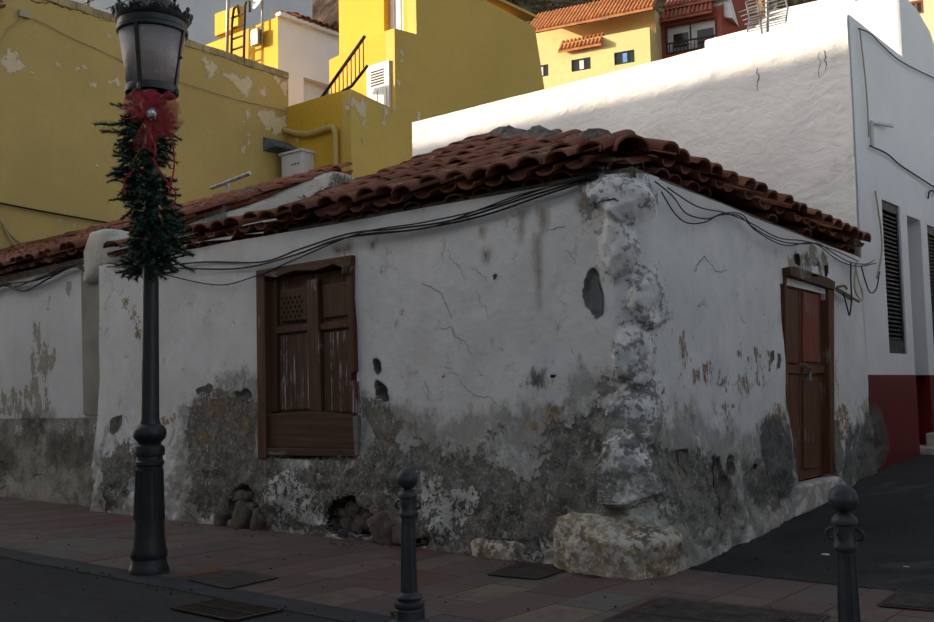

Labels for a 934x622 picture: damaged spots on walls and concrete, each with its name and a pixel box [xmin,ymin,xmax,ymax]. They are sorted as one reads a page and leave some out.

peeling [0,48,35,75]
peeling [201,56,288,98]
peeling [233,109,287,154]
peeling [345,96,367,127]
peeling [0,320,56,419]
crack [426,285,509,415]
peeling [671,330,781,430]
flaking render [183,358,623,563]
flaking render [633,430,781,543]